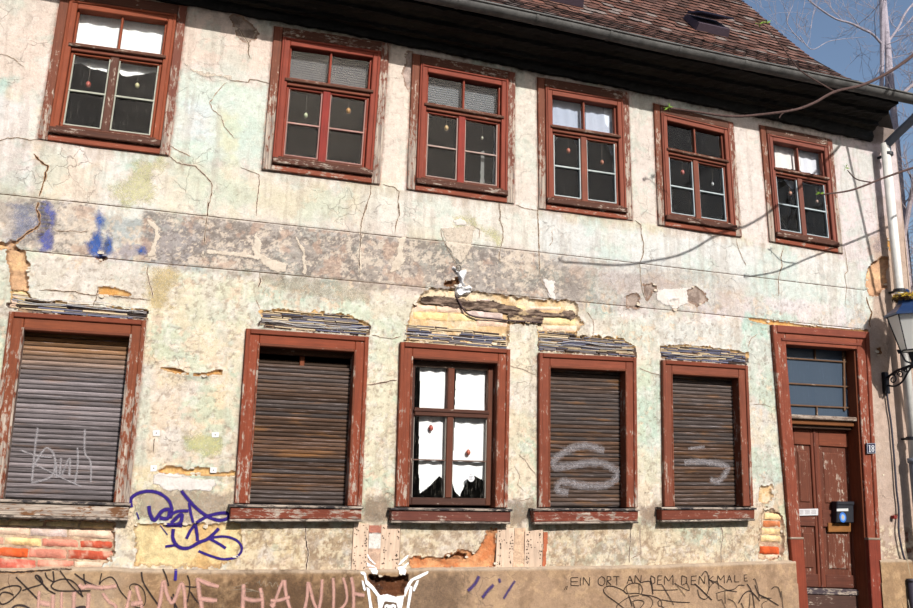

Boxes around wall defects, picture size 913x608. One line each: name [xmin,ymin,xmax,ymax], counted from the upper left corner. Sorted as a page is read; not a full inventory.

crack [209,27,269,138]
crack [0,137,86,242]
flaking render [0,239,149,320]
crack [170,146,213,244]
crack [243,168,260,216]
crack [358,184,400,274]
flaking render [404,277,637,358]
flaking render [626,282,709,312]
flaking render [865,238,890,297]
flaking render [0,518,116,568]
flaking render [368,527,498,597]
flaking render [758,484,785,561]